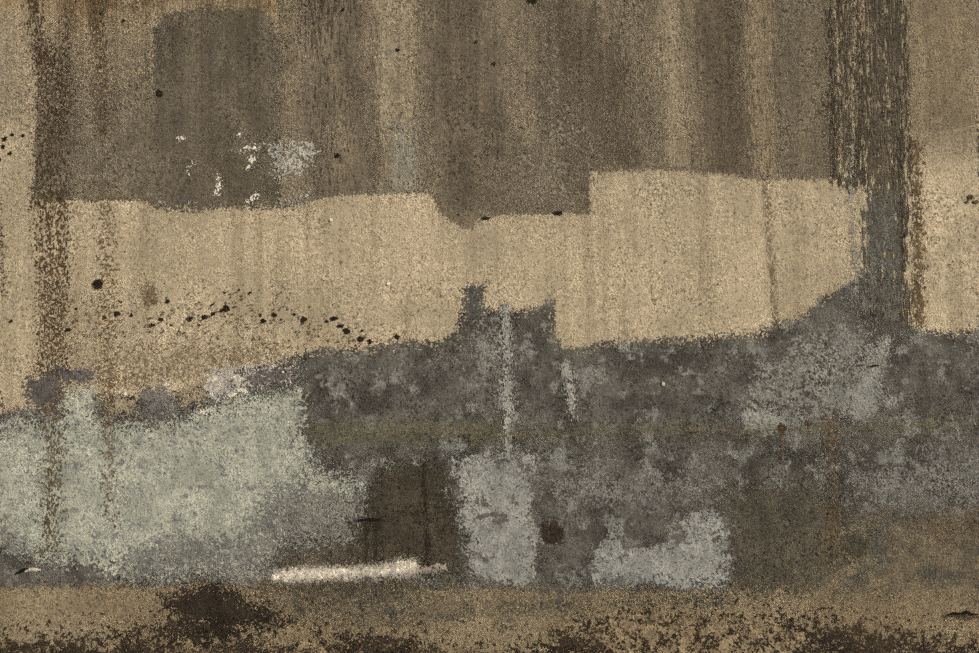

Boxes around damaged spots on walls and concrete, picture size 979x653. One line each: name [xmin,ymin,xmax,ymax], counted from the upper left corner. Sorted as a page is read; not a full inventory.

rust [0,194,11,296]
rust [19,0,396,559]
rust [905,137,929,329]
leakage [151,449,979,648]